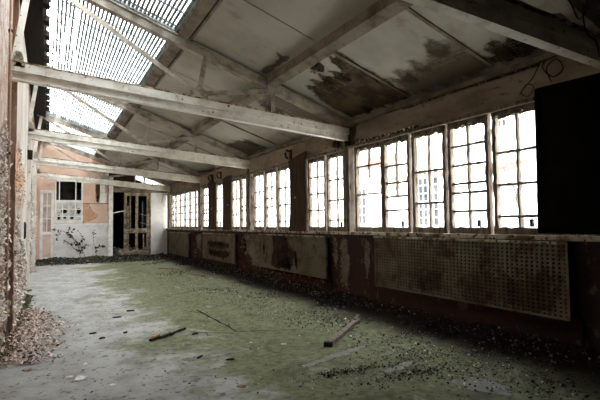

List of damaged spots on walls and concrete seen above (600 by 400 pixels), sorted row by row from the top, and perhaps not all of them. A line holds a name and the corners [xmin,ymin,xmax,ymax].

damp [262,52,289,74]
damp [307,37,538,117]
peeling [0,118,38,353]
peeling [83,204,97,223]